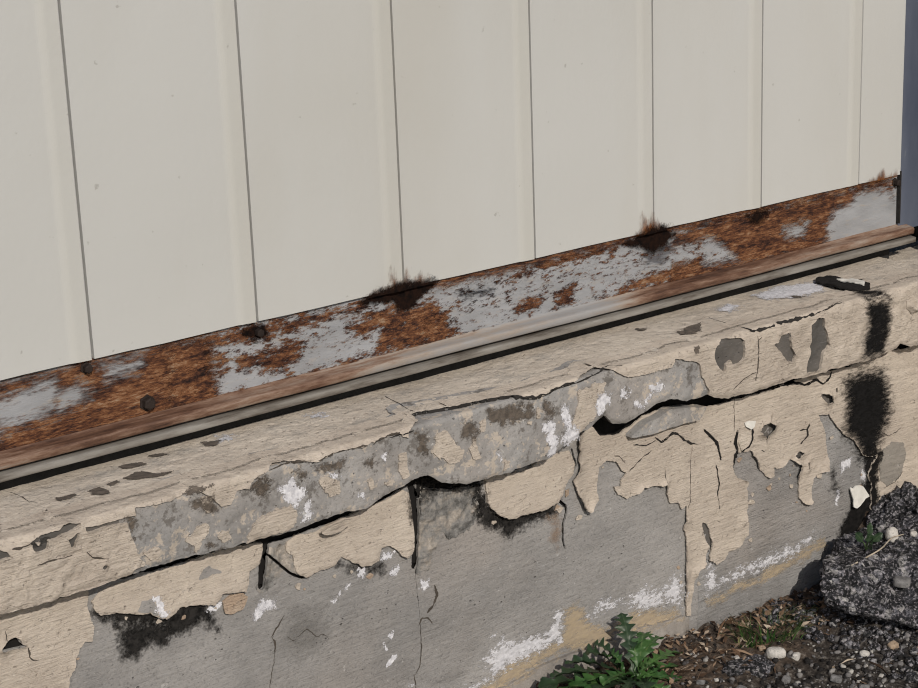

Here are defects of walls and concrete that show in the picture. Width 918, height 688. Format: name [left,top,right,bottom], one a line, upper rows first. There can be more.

rust [0,171,897,451]
peeling [715,338,743,371]
peeling [775,333,794,362]
peeling [807,318,827,373]
crack [270,365,622,470]
crack [618,301,842,509]
crack [405,477,422,564]
peeling [30,345,906,688]
leakage [409,475,563,539]
leakage [702,530,826,605]
leakage [91,602,222,660]
leakage [464,570,690,688]